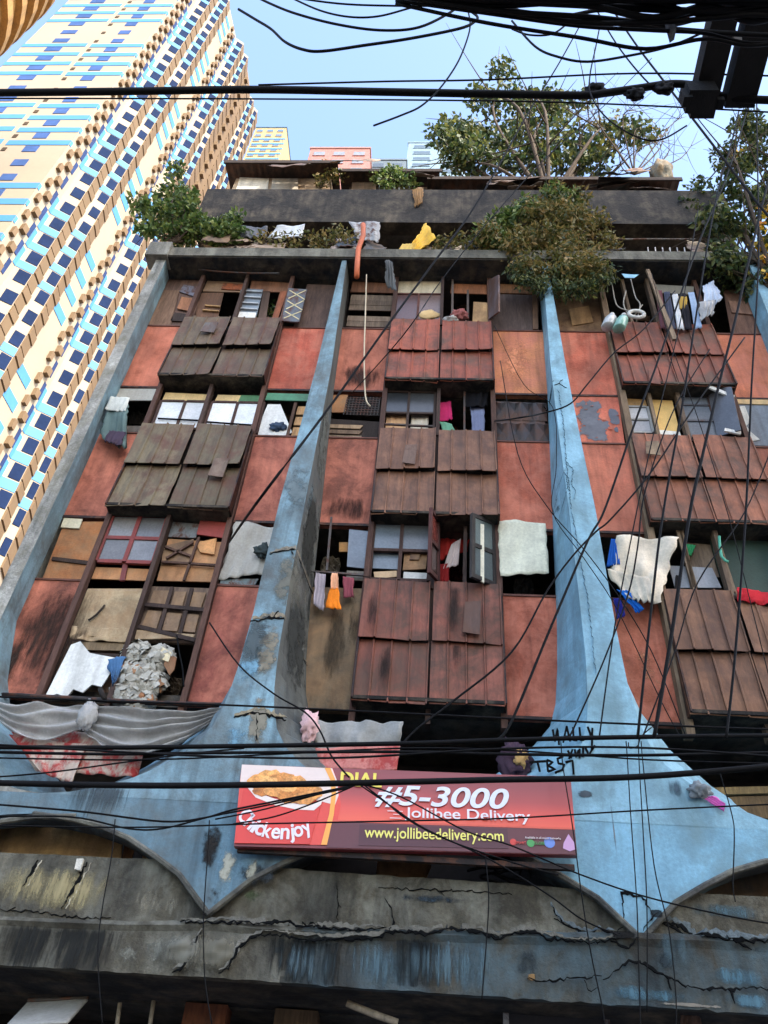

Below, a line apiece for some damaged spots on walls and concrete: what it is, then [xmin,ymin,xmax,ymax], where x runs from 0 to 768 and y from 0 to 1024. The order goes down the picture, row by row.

peeling [575,400,620,441]
leakage [275,469,319,689]
peeling [250,611,286,672]
leakage [2,925,134,970]
crack [172,887,768,1003]